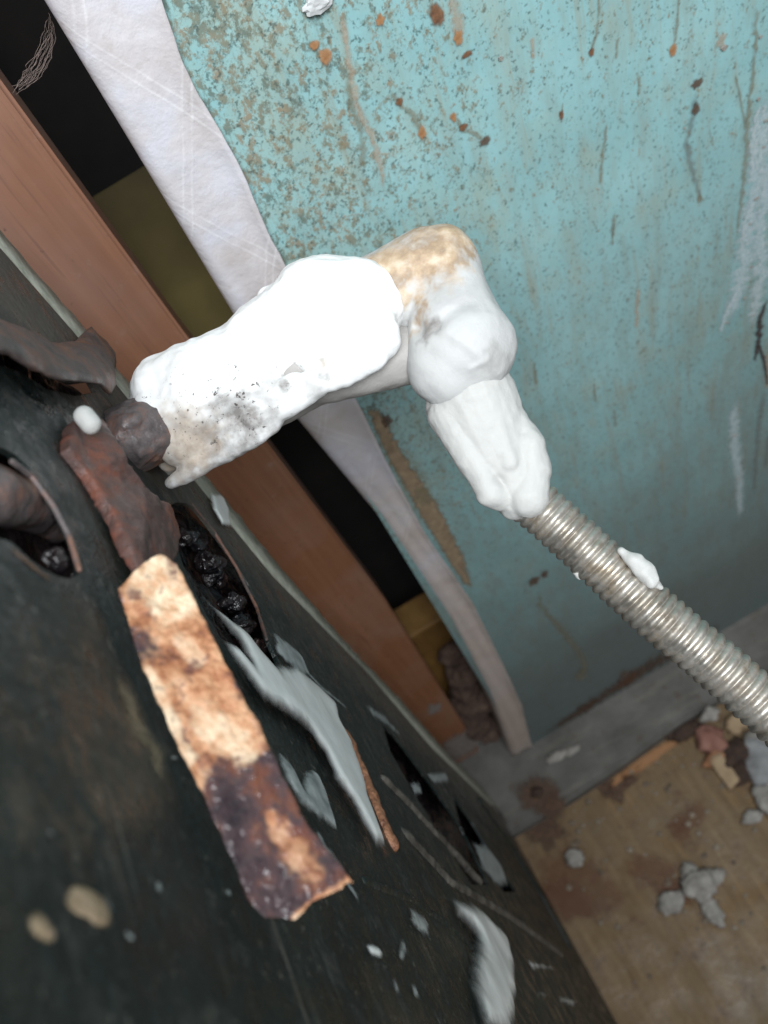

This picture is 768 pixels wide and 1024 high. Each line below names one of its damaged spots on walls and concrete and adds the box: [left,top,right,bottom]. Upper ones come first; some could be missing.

rust [310,40,331,65]
rust [430,1,472,59]